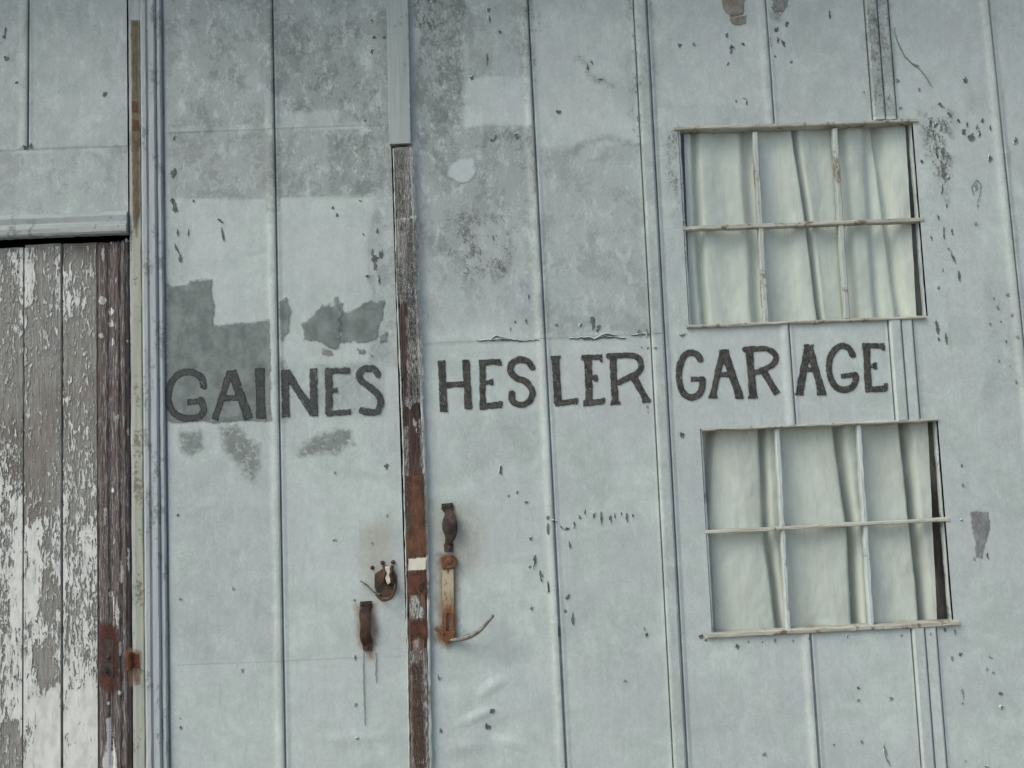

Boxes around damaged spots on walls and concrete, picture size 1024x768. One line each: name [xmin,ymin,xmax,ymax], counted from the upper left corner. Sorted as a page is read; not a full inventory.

peeling [722,0,746,65]
peeling [166,279,388,423]
peeling [0,239,131,768]
peeling [960,511,990,561]
corrosion [98,624,140,694]